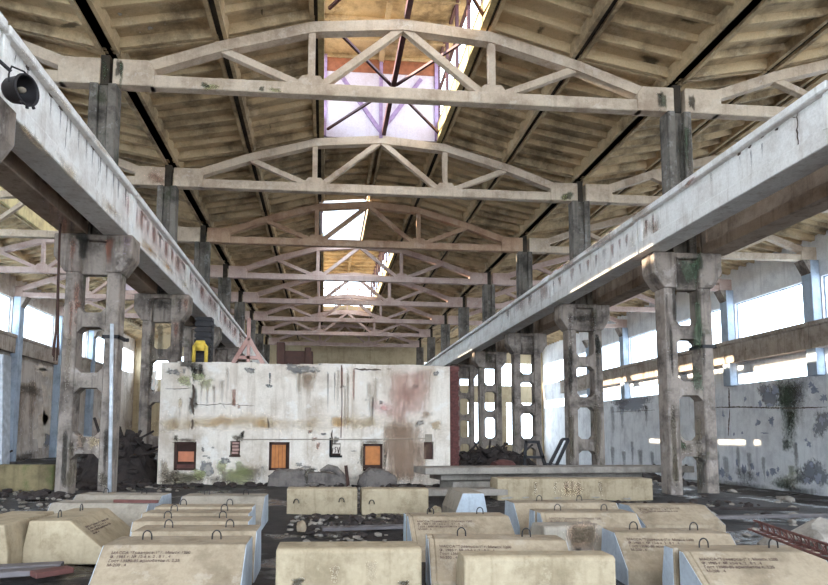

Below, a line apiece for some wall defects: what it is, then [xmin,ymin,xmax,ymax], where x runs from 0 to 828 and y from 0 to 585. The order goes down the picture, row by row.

corrosion [141,211,211,303]
damp [695,304,705,364]
damp [780,388,796,438]
peeling [200,442,240,476]
peeling [800,460,828,486]